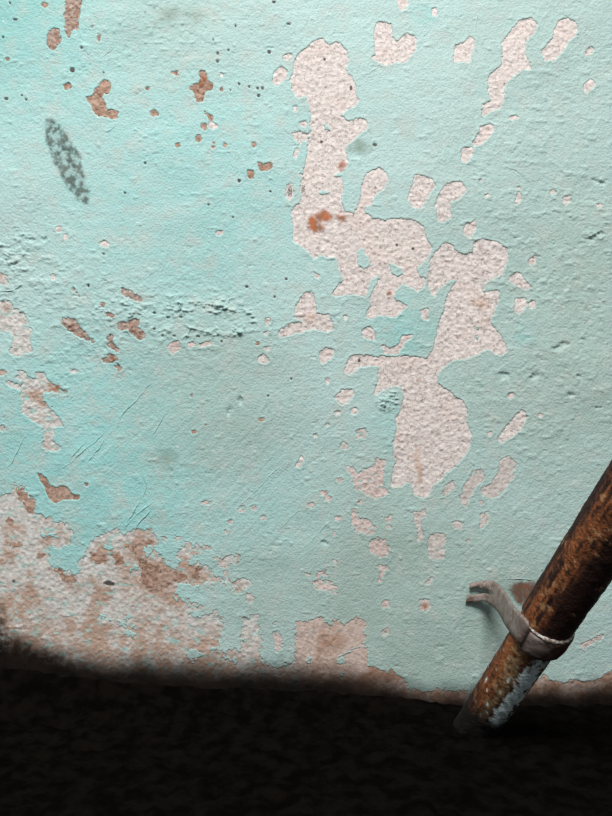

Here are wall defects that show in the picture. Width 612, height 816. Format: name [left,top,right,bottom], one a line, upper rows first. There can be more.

peeling [372,22,417,65]
peeling [86,72,119,119]
peeling [461,18,537,163]
mould [46,119,88,203]
rust [309,210,345,231]
peeling [0,299,33,357]
peeling [189,36,536,582]
peeling [0,370,67,452]
peeling [37,473,80,503]
peeling [0,482,469,696]
rust [512,582,536,604]